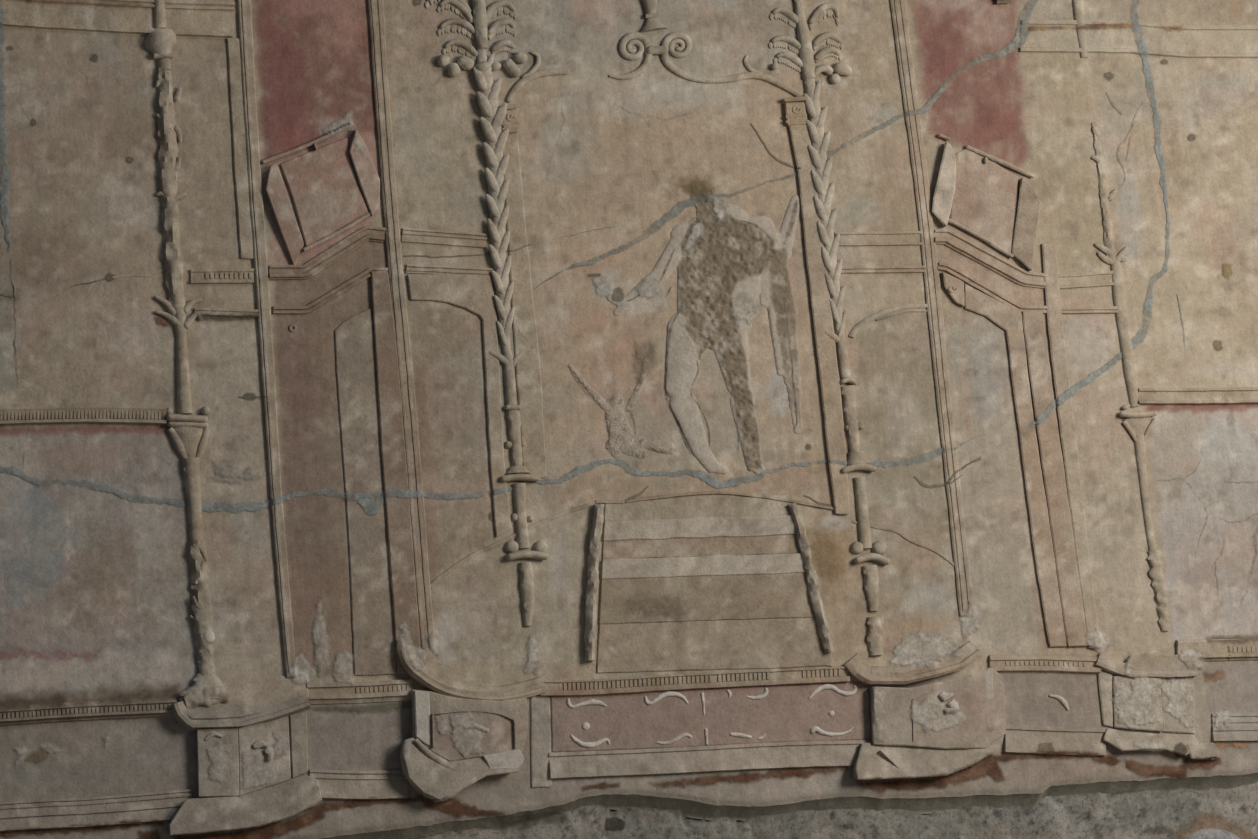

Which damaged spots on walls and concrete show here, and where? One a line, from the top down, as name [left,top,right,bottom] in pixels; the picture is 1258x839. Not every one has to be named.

peeling [713,196,729,220]
peeling [684,221,704,250]
spalling [290,602,355,684]
spalling [891,601,982,666]
spalling [1113,649,1204,757]
spalling [436,712,486,758]
corrosion [583,782,620,790]
corrosion [656,767,847,788]
corrosion [857,742,1248,792]
corrosion [2,796,504,839]